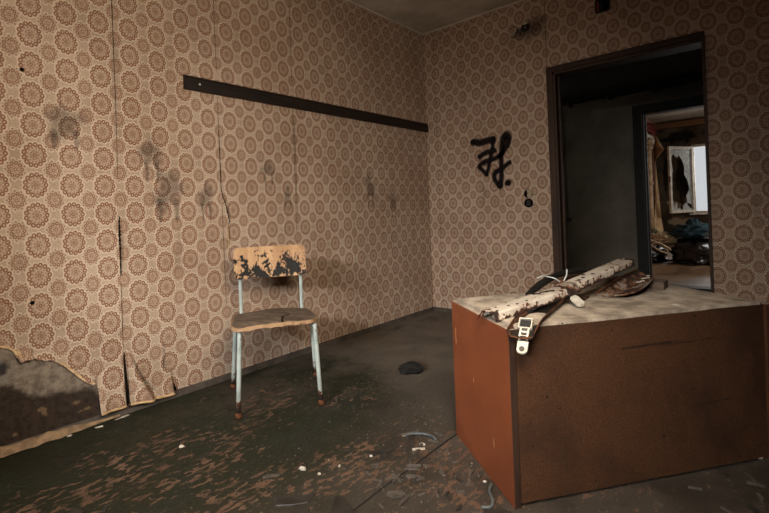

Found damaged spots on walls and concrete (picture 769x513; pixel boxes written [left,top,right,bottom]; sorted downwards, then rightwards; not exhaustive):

crack [218,130,232,248]
flaking render [0,347,99,398]